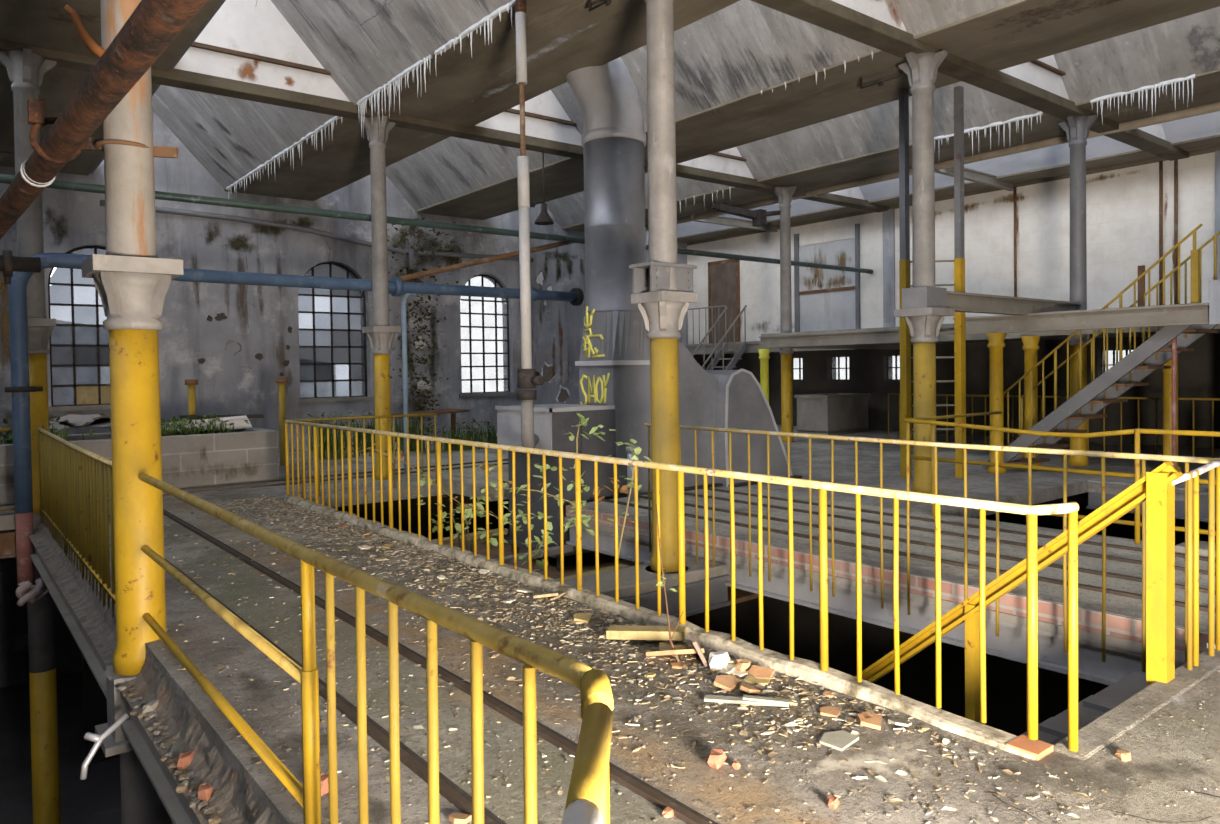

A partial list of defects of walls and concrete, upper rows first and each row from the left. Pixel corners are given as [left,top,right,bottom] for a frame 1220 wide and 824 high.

rust [239,60,259,79]
crack [987,790,1220,824]